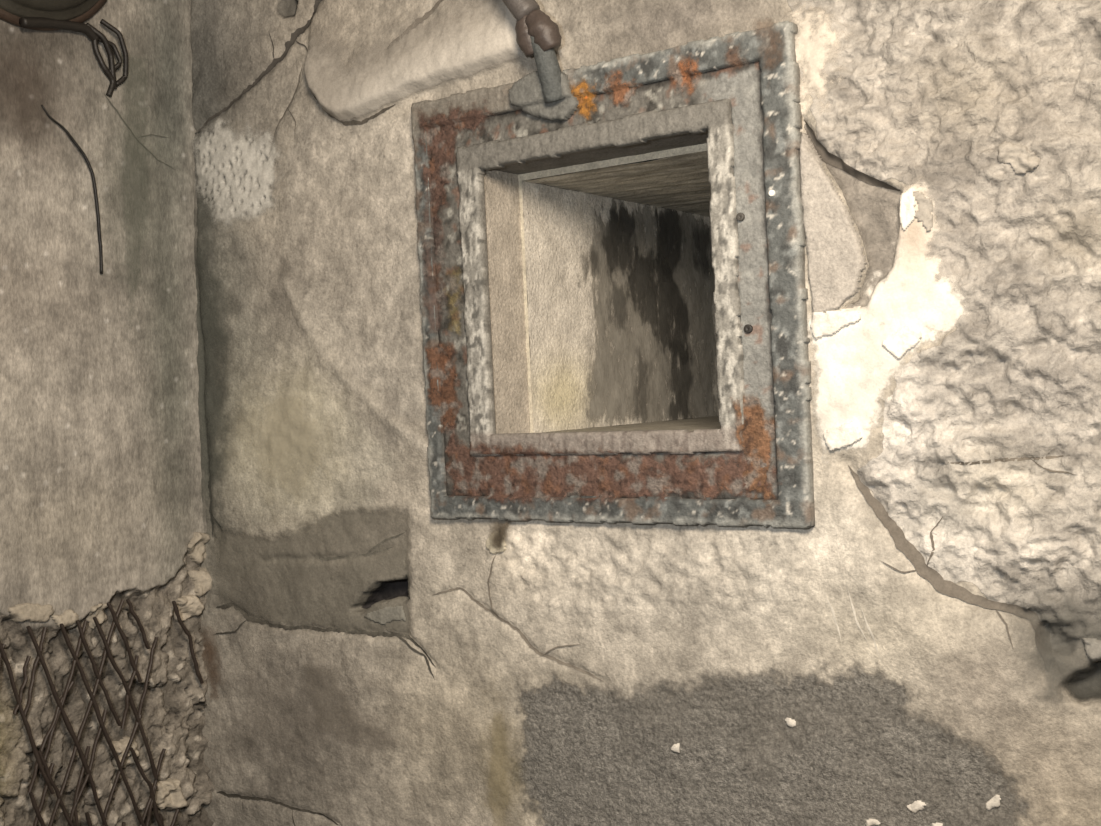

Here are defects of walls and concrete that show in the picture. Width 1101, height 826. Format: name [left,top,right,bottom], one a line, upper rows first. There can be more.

crack [105,0,322,169]
rust [571,71,634,119]
rust [669,59,700,94]
rust [418,106,777,504]
leakage [586,199,717,427]
spalling [787,0,1101,663]
flaking render [0,532,215,826]
crack [208,476,222,536]
spalling [362,579,408,625]
crack [433,555,604,682]
crack [848,465,1051,671]
spalling [1065,675,1101,701]